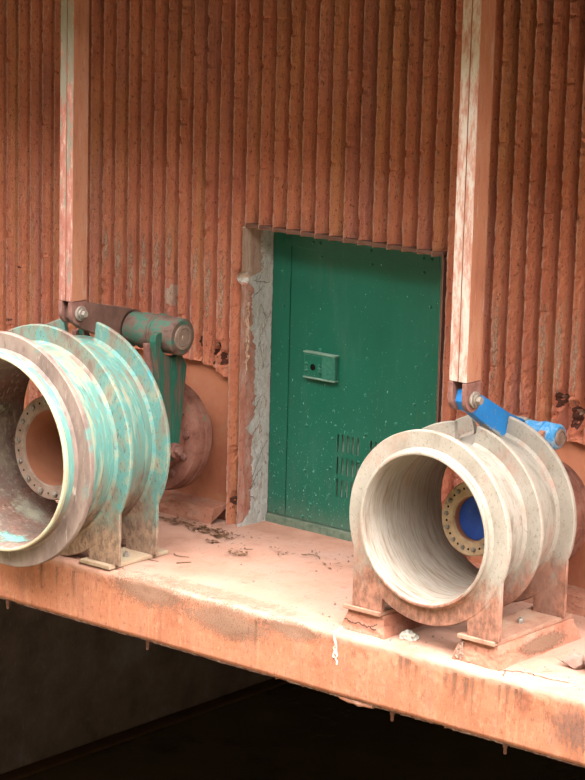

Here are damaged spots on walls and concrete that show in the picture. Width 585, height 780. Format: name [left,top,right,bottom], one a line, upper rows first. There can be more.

peeling [103,228,172,298]
spalling [213,342,229,365]
peeling [230,228,265,524]
peeling [555,306,585,430]
water stain [332,626,343,665]
crack [344,618,377,631]